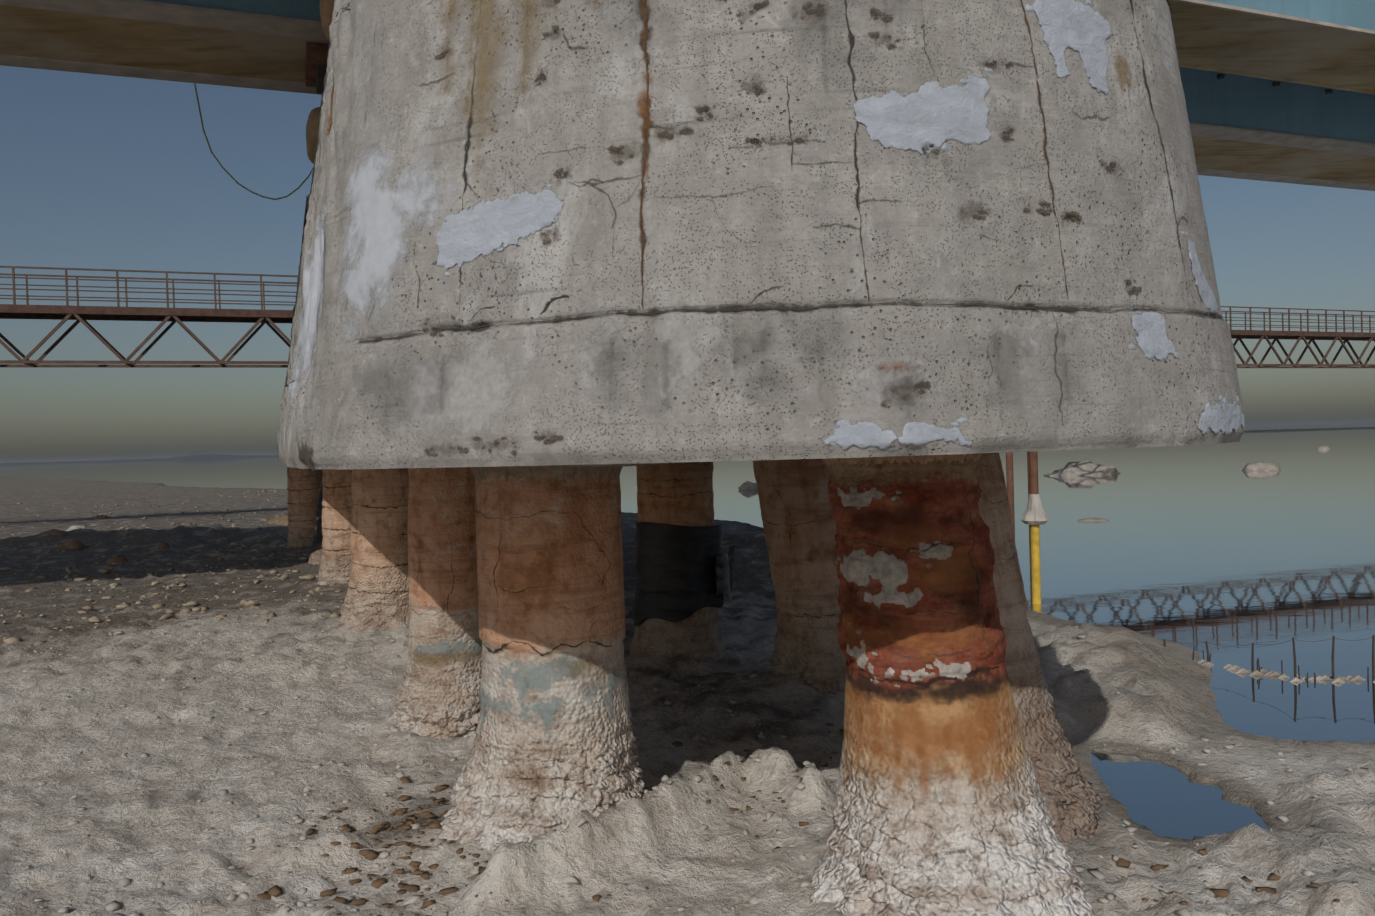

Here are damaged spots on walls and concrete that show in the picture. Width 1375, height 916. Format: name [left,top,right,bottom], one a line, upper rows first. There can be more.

flaking render [1025,0,1111,94]
rust [638,78,649,134]
flaking render [852,61,1014,155]
flaking render [343,152,568,315]
crack [345,0,1224,421]
flaking render [1125,279,1179,361]
flaking render [823,418,972,450]
spalling [881,381,931,406]
flaking render [1198,395,1245,436]